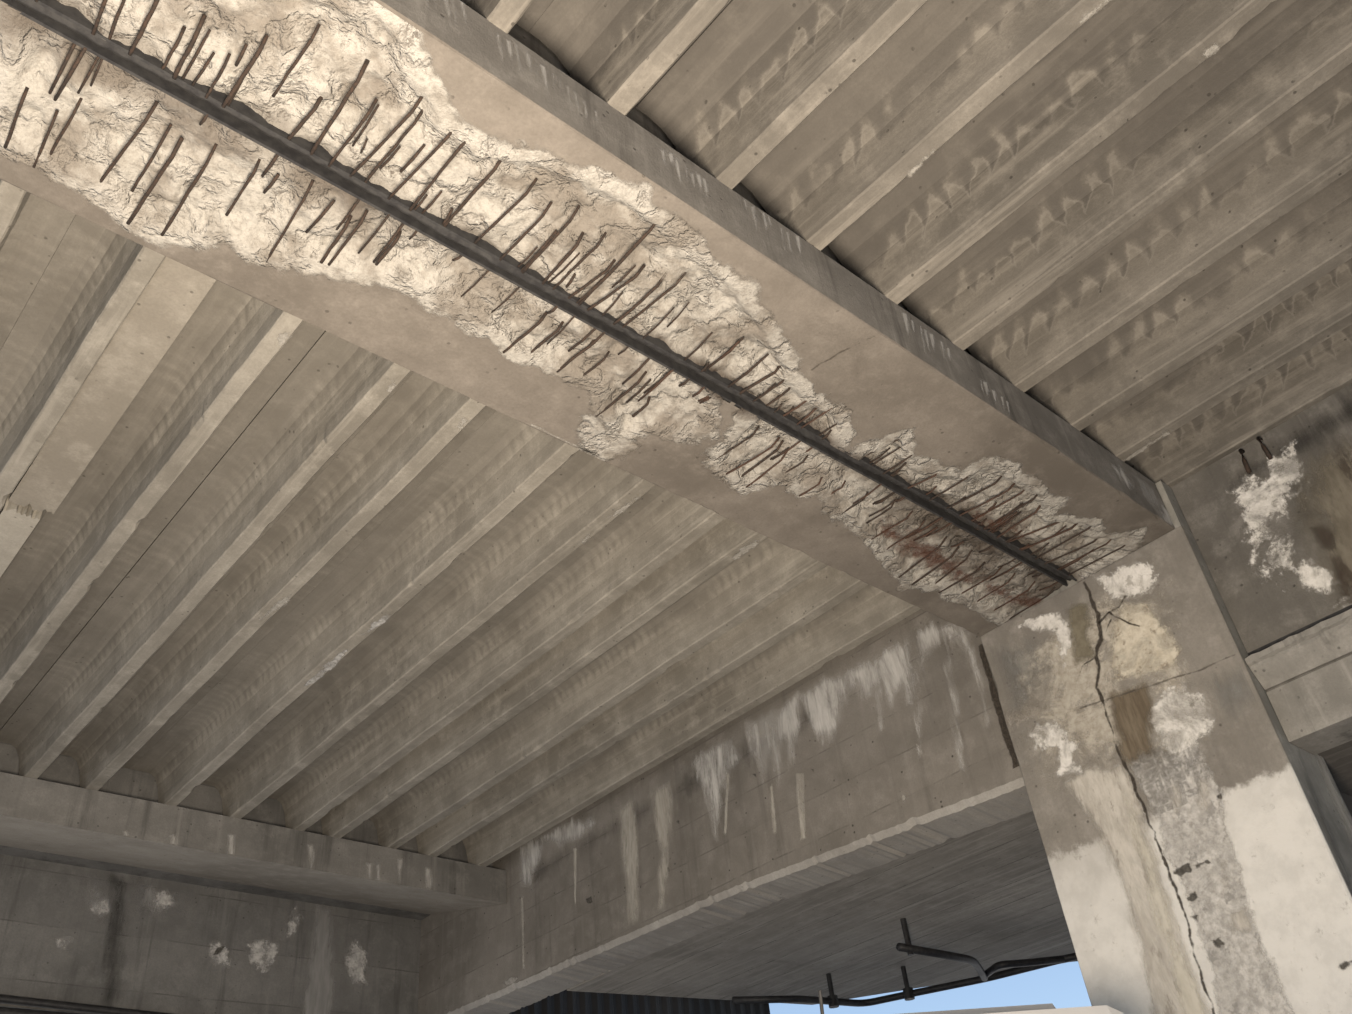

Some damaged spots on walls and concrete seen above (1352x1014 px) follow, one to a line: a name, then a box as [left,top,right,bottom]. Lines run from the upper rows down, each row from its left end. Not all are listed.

spalling [0,0,1148,626]
corrosion [882,527,973,583]
damp [1227,408,1352,596]
efflorescence [749,647,910,754]
crack [979,644,1019,769]
damp [1005,562,1214,776]
efflorescence [696,747,737,833]
crack [1082,582,1215,1014]
efflorescence [521,820,592,903]
efflorescence [623,806,637,905]
damp [248,917,299,972]
damp [304,909,367,1014]